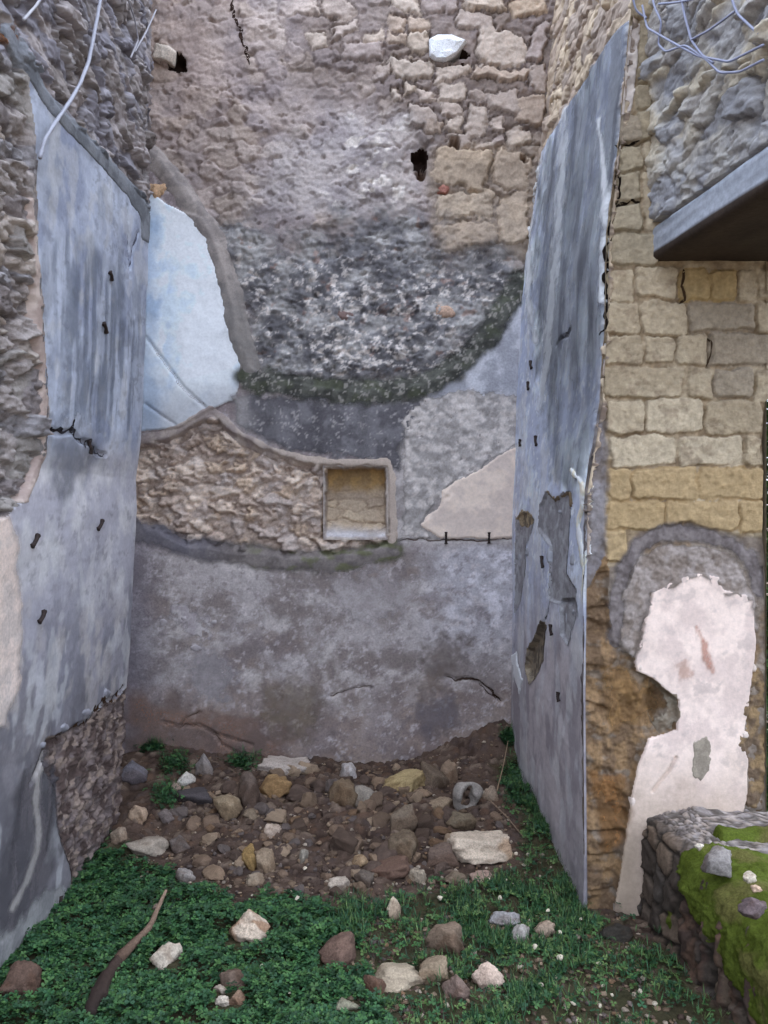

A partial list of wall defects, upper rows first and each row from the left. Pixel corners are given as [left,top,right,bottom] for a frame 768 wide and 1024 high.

crack [230,0,250,65]
spalling [0,52,54,517]
crack [599,176,640,335]
crack [49,419,104,457]
spalling [135,145,524,628]
spalling [38,684,127,885]
crack [446,676,501,701]
spalling [511,467,758,920]
spalling [738,662,766,812]